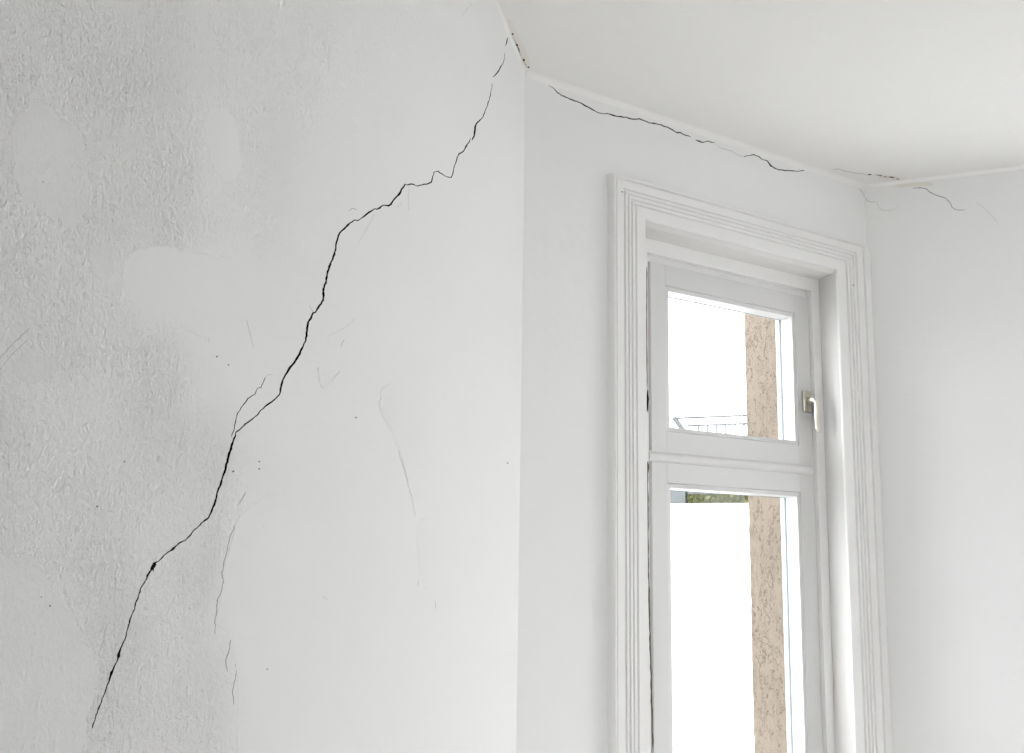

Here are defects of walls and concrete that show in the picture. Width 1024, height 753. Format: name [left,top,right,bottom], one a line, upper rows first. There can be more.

crack [549,85,805,172]
crack [833,168,998,224]
crack [92,36,523,728]